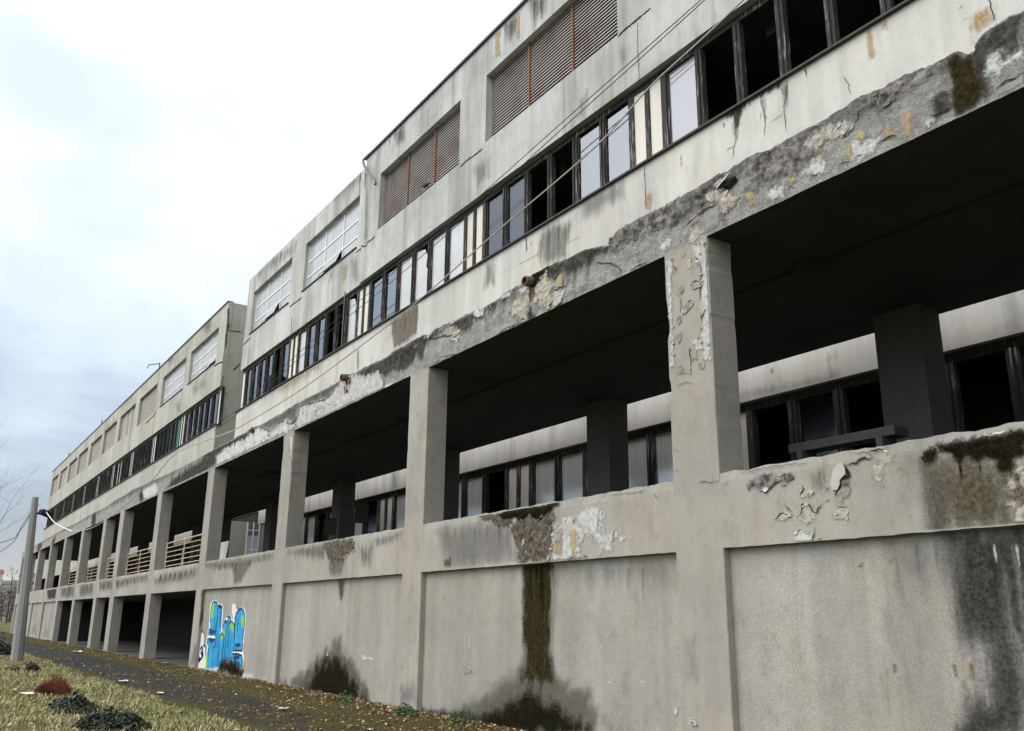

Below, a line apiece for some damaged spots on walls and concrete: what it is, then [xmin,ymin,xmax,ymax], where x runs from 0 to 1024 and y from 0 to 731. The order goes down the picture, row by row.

corrosion [970,10,991,31]
crack [727,89,825,158]
spalling [868,65,933,109]
spalling [925,91,955,127]
spalling [600,120,854,373]
spalling [502,270,564,331]
peeling [216,370,393,464]
spalling [479,502,627,563]
spalling [747,470,816,541]
damp [951,527,1024,731]
damp [293,639,376,704]
damp [421,675,596,731]